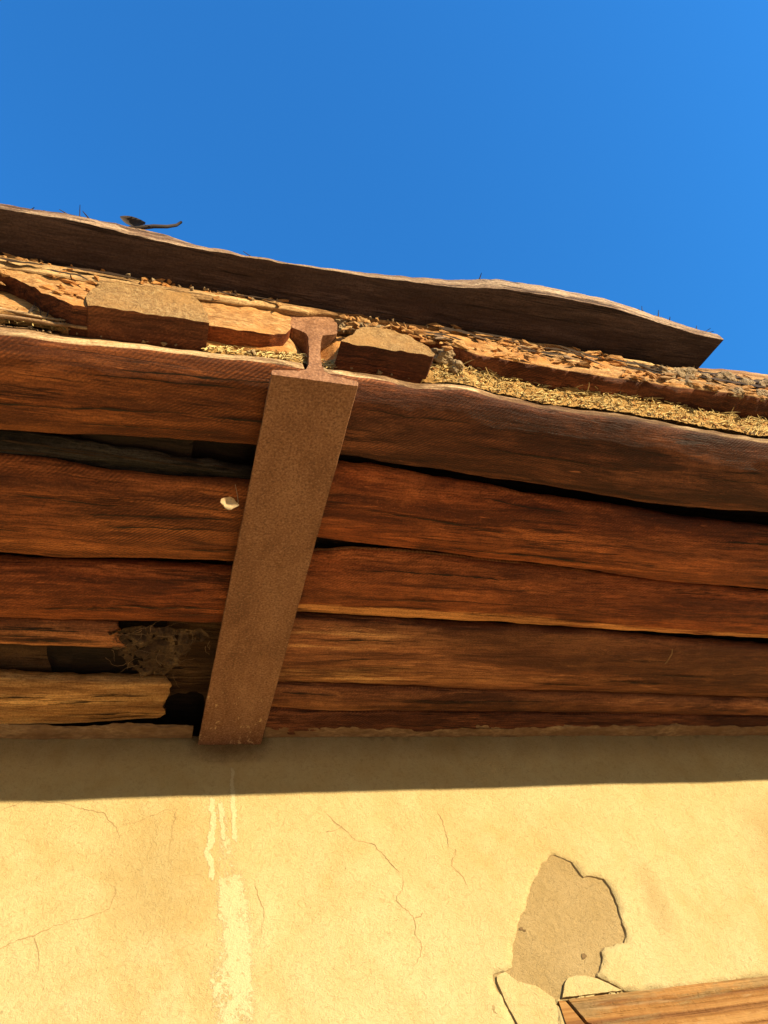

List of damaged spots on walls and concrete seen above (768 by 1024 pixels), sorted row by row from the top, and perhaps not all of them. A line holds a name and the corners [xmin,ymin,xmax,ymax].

crack [0,889,116,975]
water stain [204,767,257,1024]
crack [318,805,423,965]
peeling [492,855,625,1024]